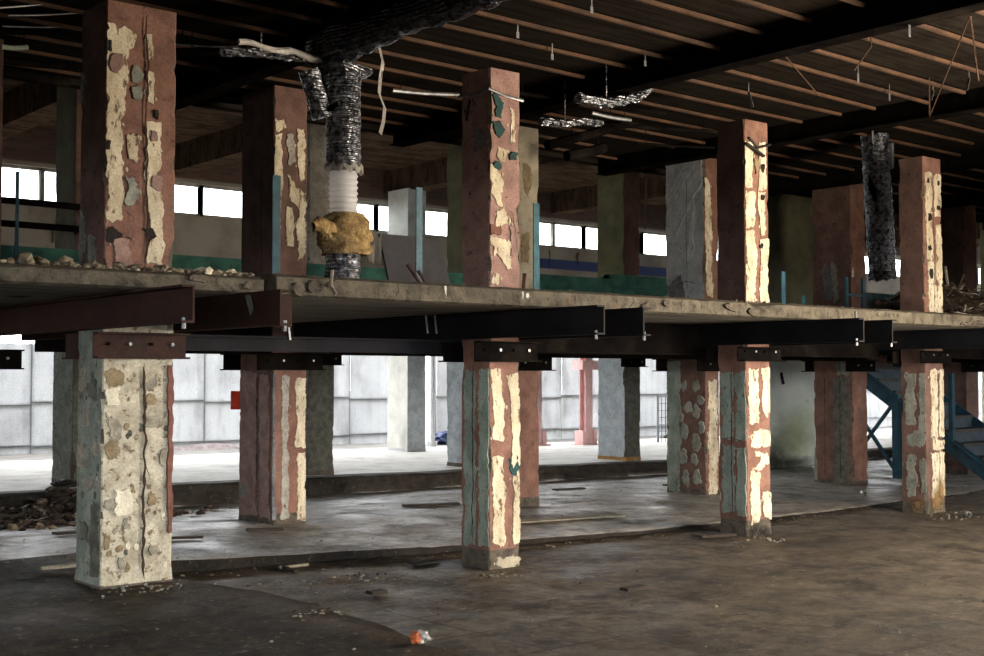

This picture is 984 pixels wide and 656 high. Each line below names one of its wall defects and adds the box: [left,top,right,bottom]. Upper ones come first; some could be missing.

peeling [78,22,165,265]
peeling [274,118,307,261]
peeling [665,141,770,316]
peeling [924,171,943,313]
crack [139,363,151,577]
peeling [239,370,306,521]
crack [172,366,474,574]
peeling [463,368,521,568]
crack [519,369,740,545]
peeling [707,367,772,526]
crack [770,501,903,521]
peeling [904,368,945,498]